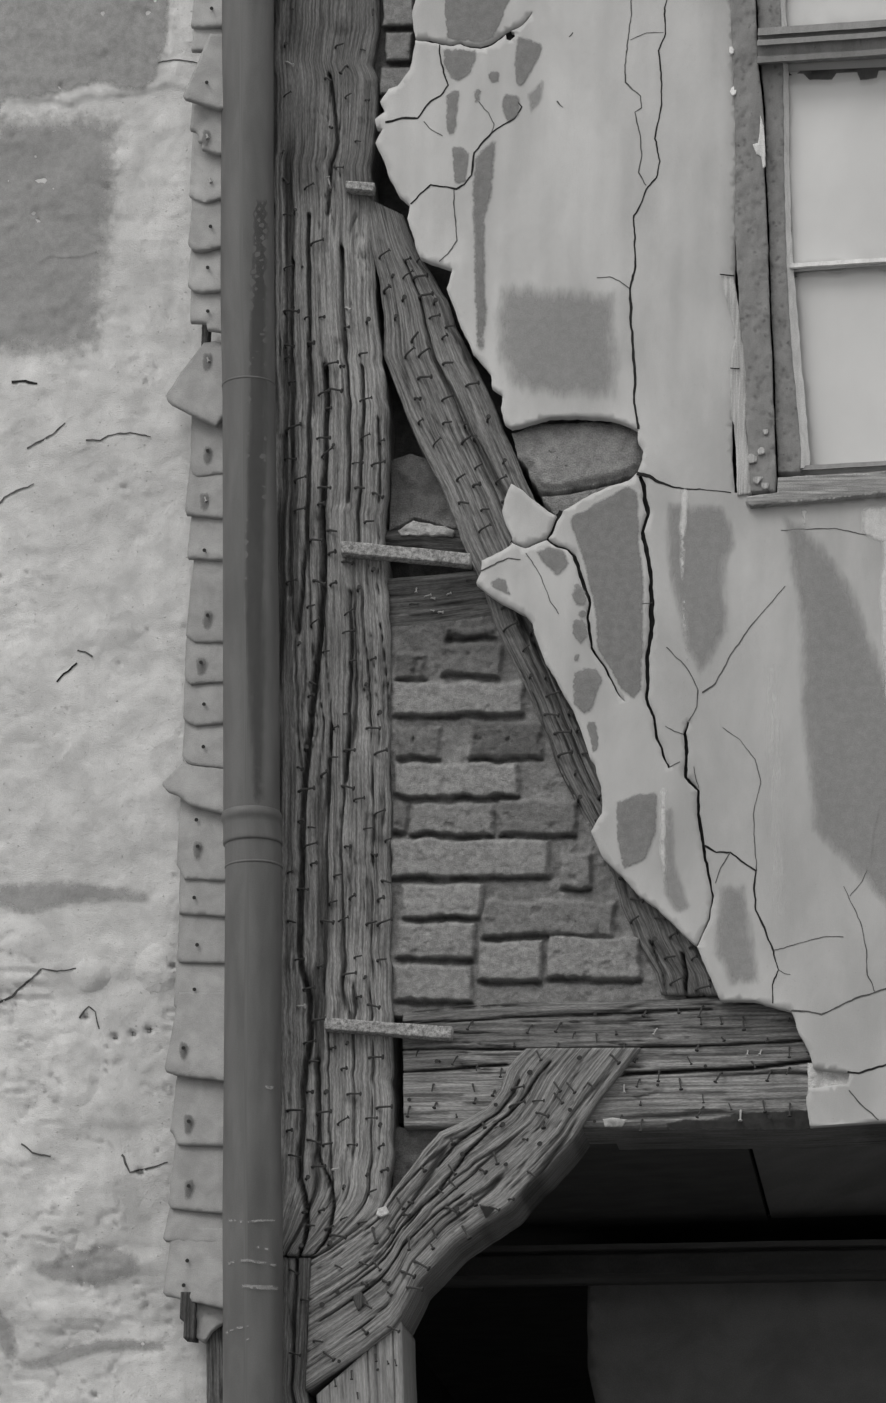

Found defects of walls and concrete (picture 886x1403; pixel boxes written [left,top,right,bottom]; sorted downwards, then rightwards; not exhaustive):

crack [385,31,512,136]
crack [410,101,522,262]
leakage [473,142,495,347]
crack [597,0,667,429]
peeling [753,116,766,168]
leakage [503,292,609,389]
peeling [720,274,769,496]
spalling [512,422,643,515]
crack [480,472,886,1015]
leakage [795,507,886,895]
crack [0,968,76,1003]
crack [79,1006,100,1029]